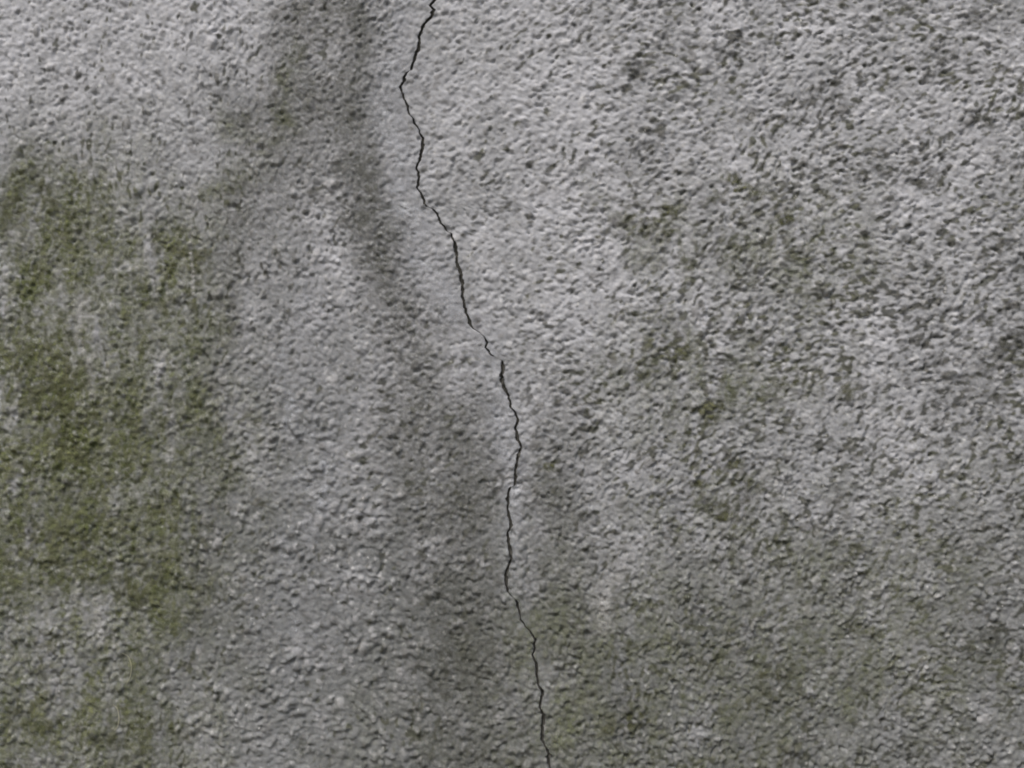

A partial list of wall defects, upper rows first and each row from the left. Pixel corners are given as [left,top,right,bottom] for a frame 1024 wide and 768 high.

crack [399,0,552,768]